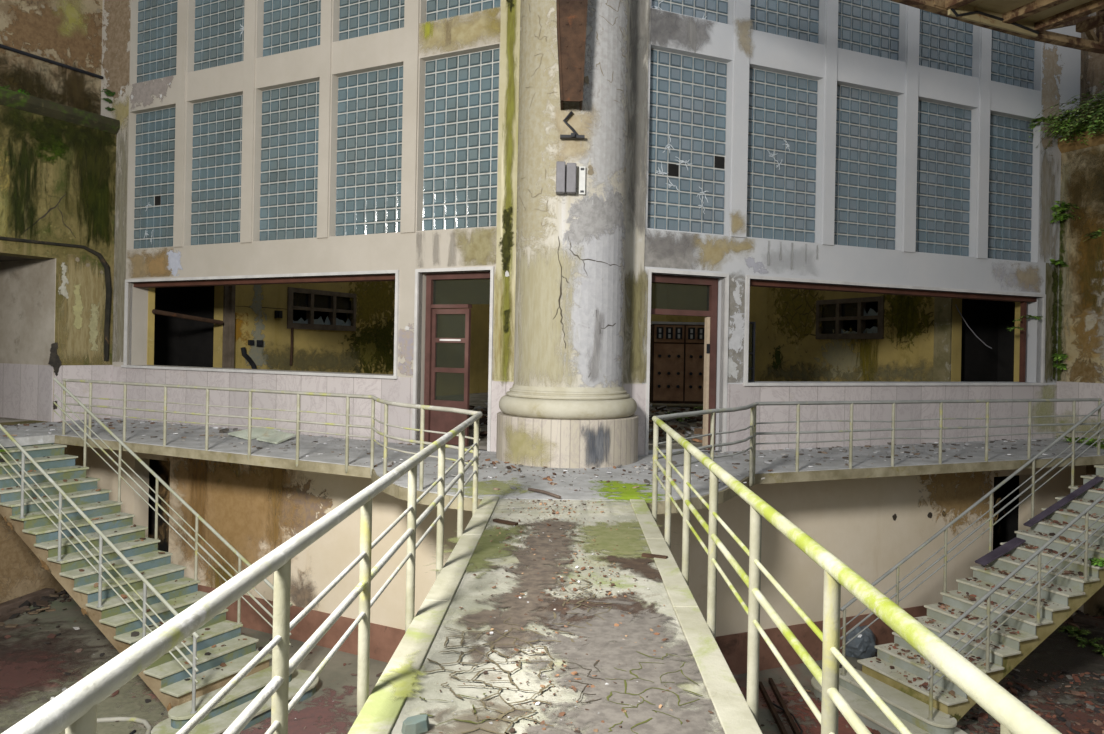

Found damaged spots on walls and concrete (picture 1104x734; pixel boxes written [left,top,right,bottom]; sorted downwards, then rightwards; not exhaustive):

peeling [0,0,174,109]
peeling [737,20,752,54]
leakage [0,194,12,237]
peeling [165,250,183,276]
crack [519,169,621,348]
leakage [416,0,753,388]
peeling [727,257,768,383]
peeling [1084,269,1104,382]
leakage [582,426,610,467]
leakage [0,514,43,601]
crack [419,578,702,734]